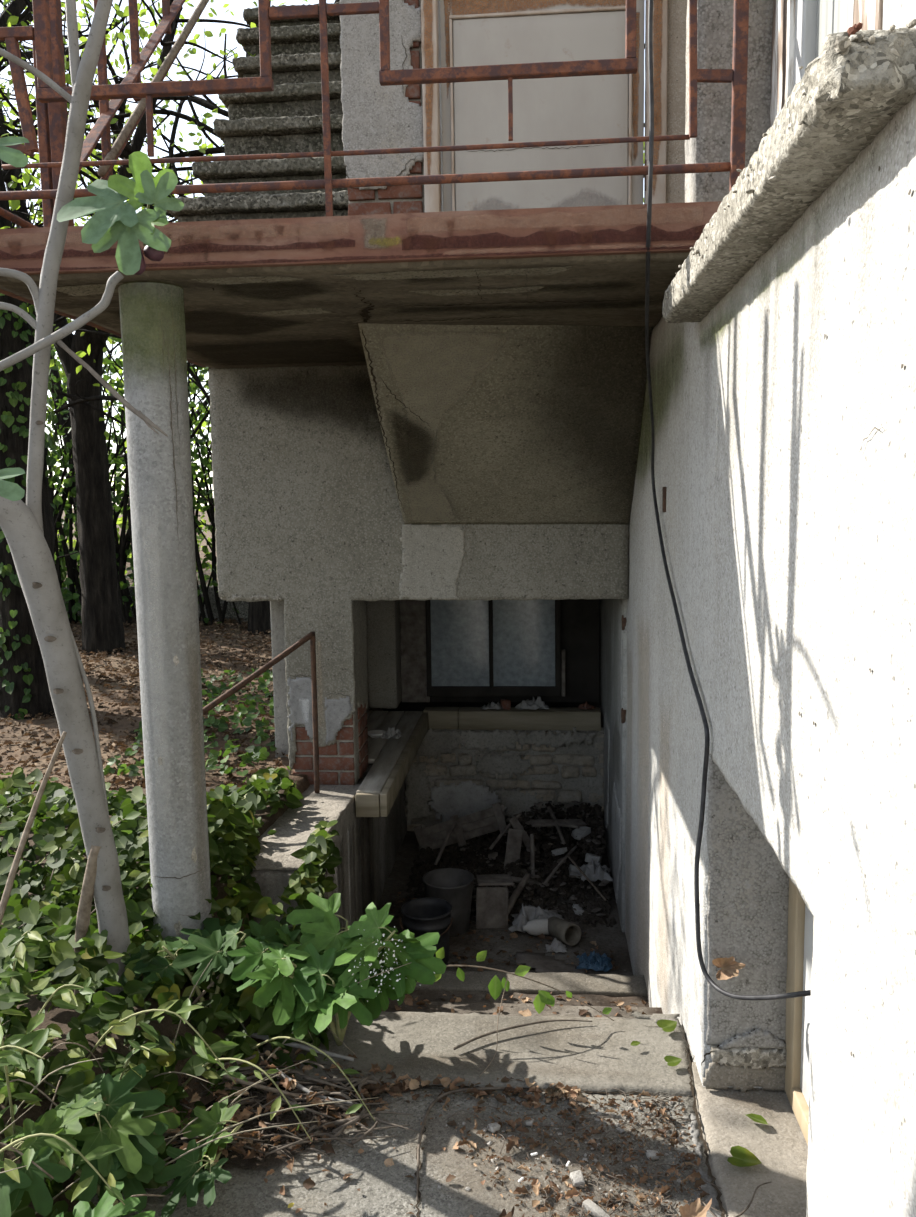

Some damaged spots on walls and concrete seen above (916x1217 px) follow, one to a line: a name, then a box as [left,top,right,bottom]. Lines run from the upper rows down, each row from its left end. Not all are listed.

spalling [833,22,876,53]
rust [423,0,662,194]
rust [0,242,45,271]
rust [59,248,118,270]
damp [225,282,324,300]
rust [142,223,706,267]
damp [398,283,642,312]
spalling [663,223,716,311]
damp [185,312,432,482]
flaking render [287,674,353,744]
spalling [702,1045,787,1093]
crack [378,1083,479,1217]